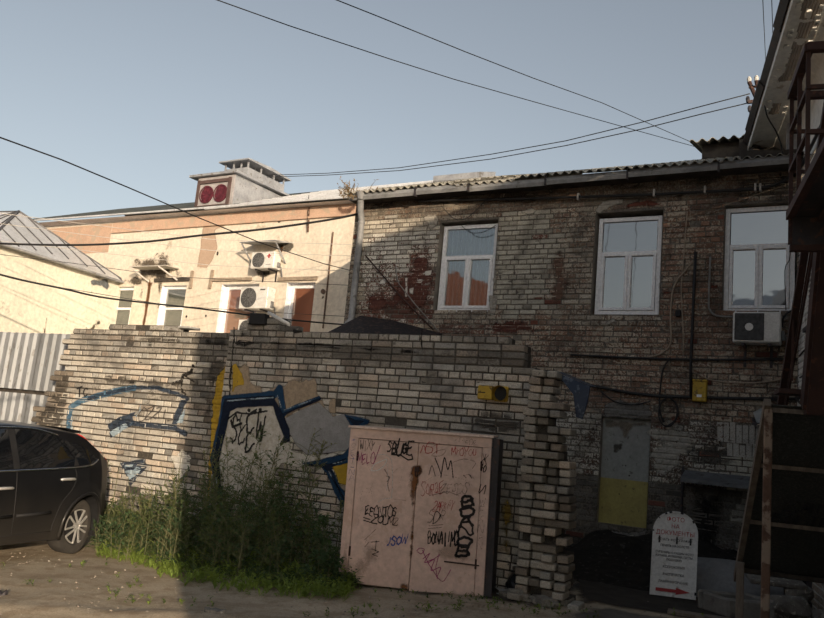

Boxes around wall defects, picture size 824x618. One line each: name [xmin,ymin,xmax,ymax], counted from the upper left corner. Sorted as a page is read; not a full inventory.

peeling [795,0,824,42]
peeling [198,225,224,267]
peeling [368,246,433,313]
peeling [208,364,351,500]
corrosion [410,466,422,505]